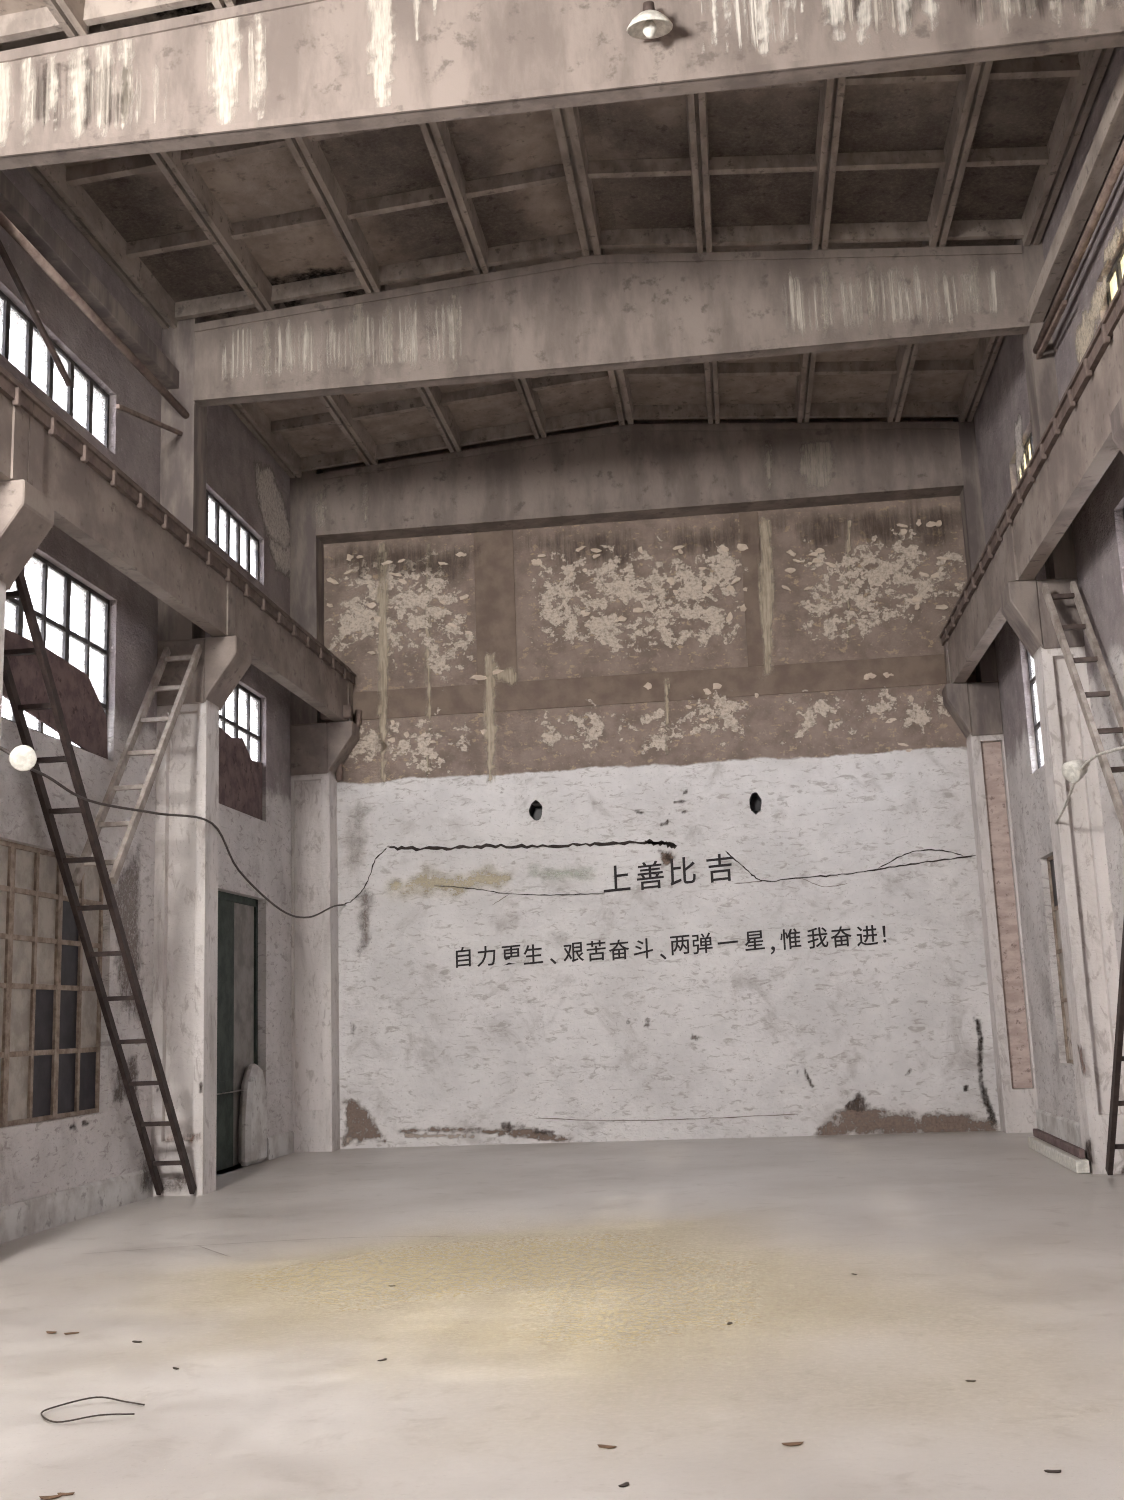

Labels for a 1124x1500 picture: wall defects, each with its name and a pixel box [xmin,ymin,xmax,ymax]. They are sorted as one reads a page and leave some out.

peeling [527,535,749,658]
peeling [782,519,966,644]
peeling [325,549,504,776]
peeling [535,683,759,755]
peeling [780,672,950,752]
spalling [343,1099,571,1146]
spalling [816,1019,997,1136]